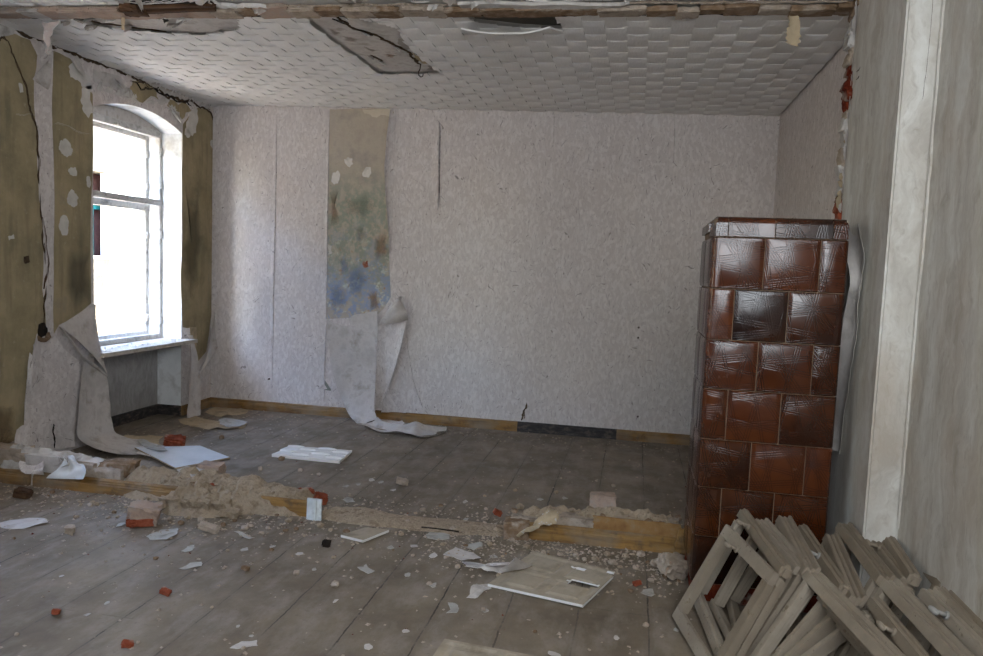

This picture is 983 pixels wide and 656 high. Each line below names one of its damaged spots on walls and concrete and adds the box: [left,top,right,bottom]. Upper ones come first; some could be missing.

peeling [33,60,54,339]
flaking render [0,0,859,220]
spalling [0,442,141,485]